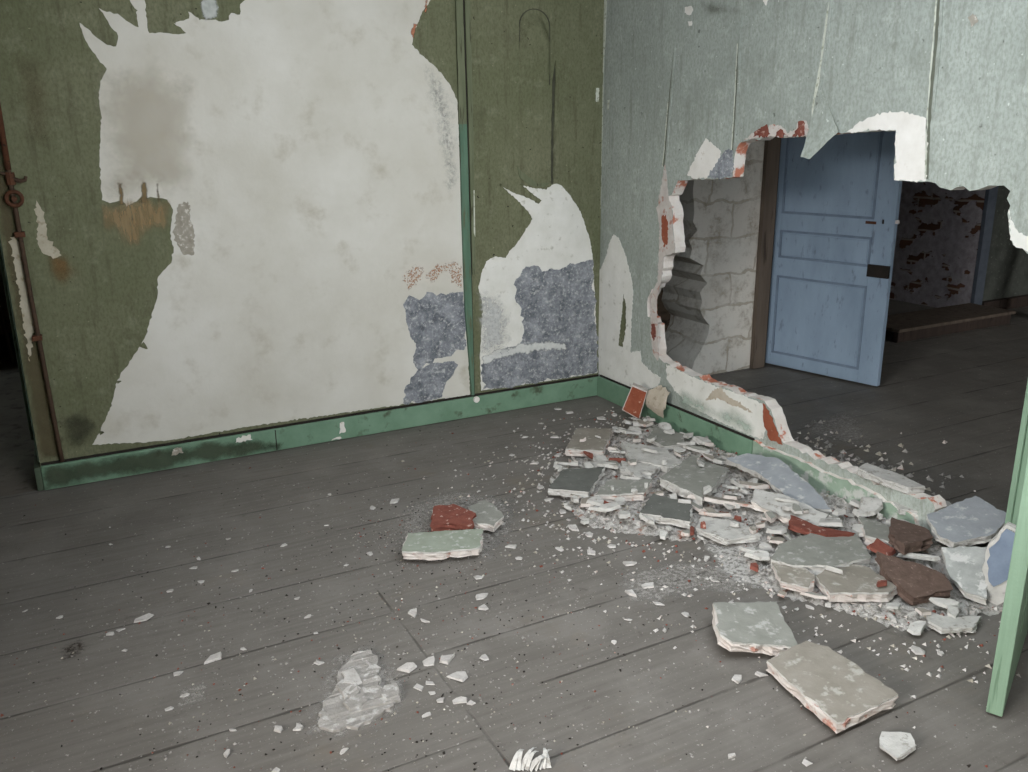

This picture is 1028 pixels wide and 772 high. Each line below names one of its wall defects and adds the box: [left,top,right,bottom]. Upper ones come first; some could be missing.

crack [924,0,944,179]
flaking render [745,120,809,140]
flaking render [847,111,928,183]
peeling [34,201,62,259]
peeling [80,0,783,455]
flaking render [1008,210,1028,252]
peeling [9,236,34,361]